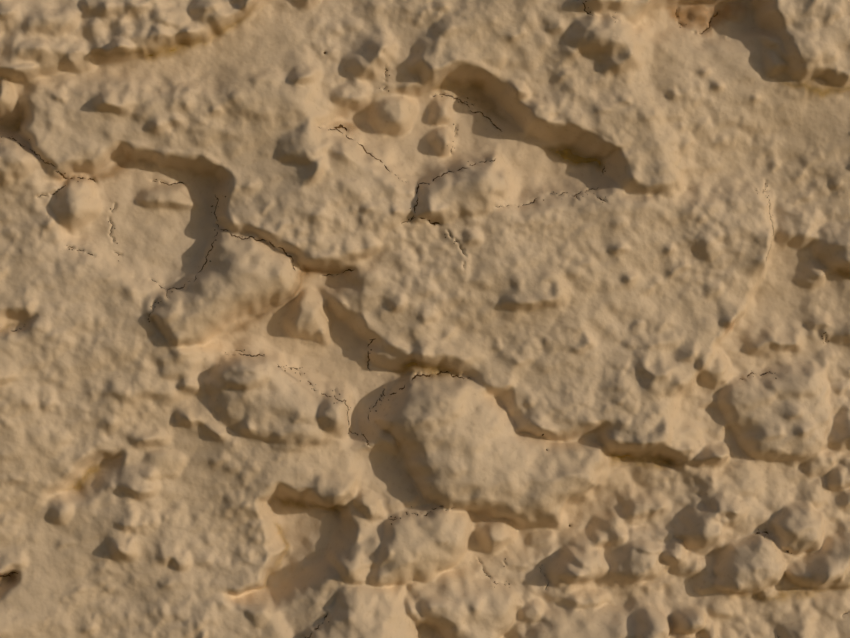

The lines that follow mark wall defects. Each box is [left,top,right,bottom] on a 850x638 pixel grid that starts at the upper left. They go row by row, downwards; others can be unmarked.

crack [433,94,502,132]
crack [1,137,95,197]
crack [319,124,399,179]
crack [401,124,495,266]
crack [499,167,606,207]
crack [148,196,295,322]
crack [225,350,465,446]